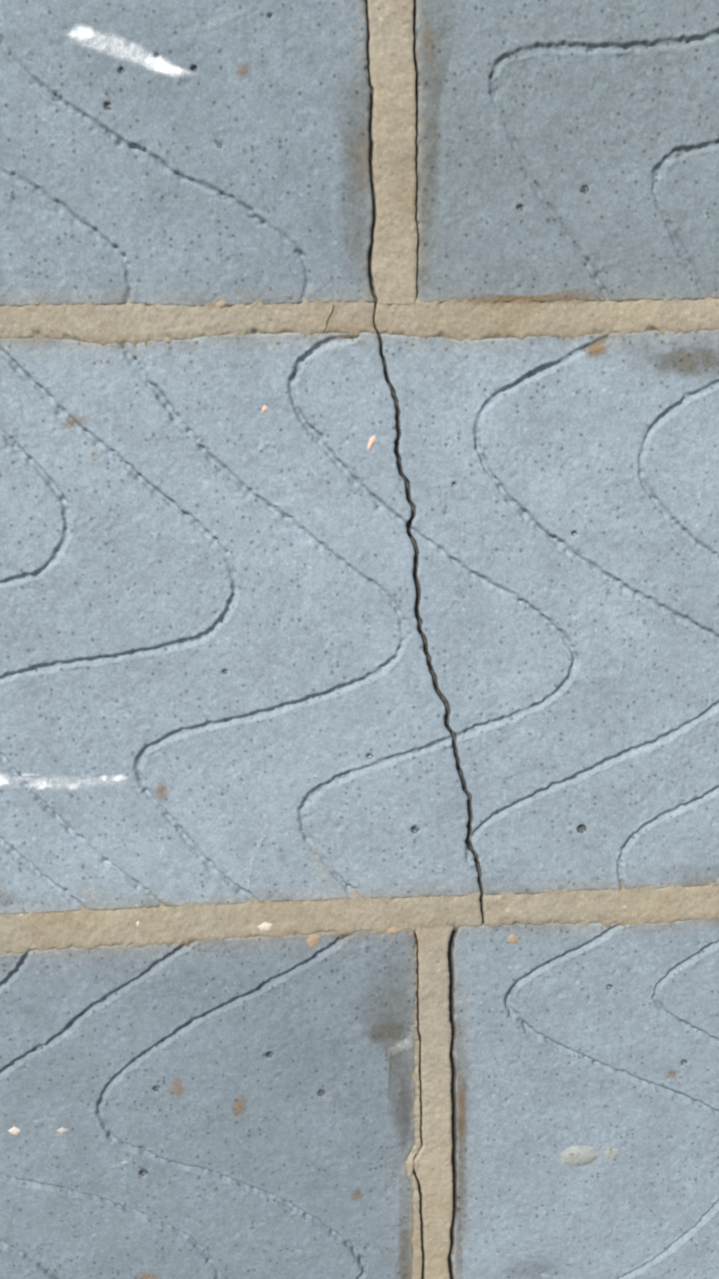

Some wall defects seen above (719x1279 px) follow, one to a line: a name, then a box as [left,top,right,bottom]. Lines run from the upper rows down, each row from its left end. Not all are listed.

crack [365,0,484,1279]